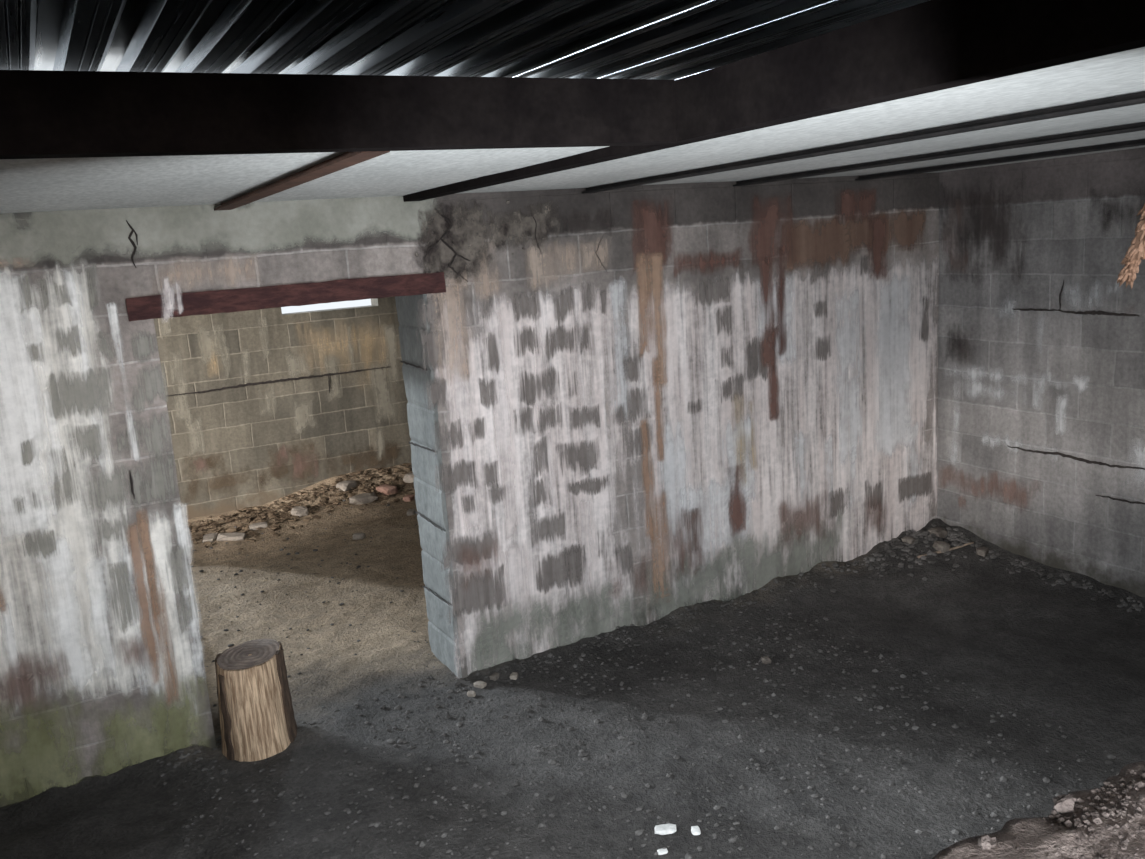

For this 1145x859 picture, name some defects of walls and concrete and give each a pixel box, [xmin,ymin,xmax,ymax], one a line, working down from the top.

corrosion [633,190,925,597]
crack [1008,446,1145,470]
crack [1095,495,1145,505]
corrosion [129,514,177,704]